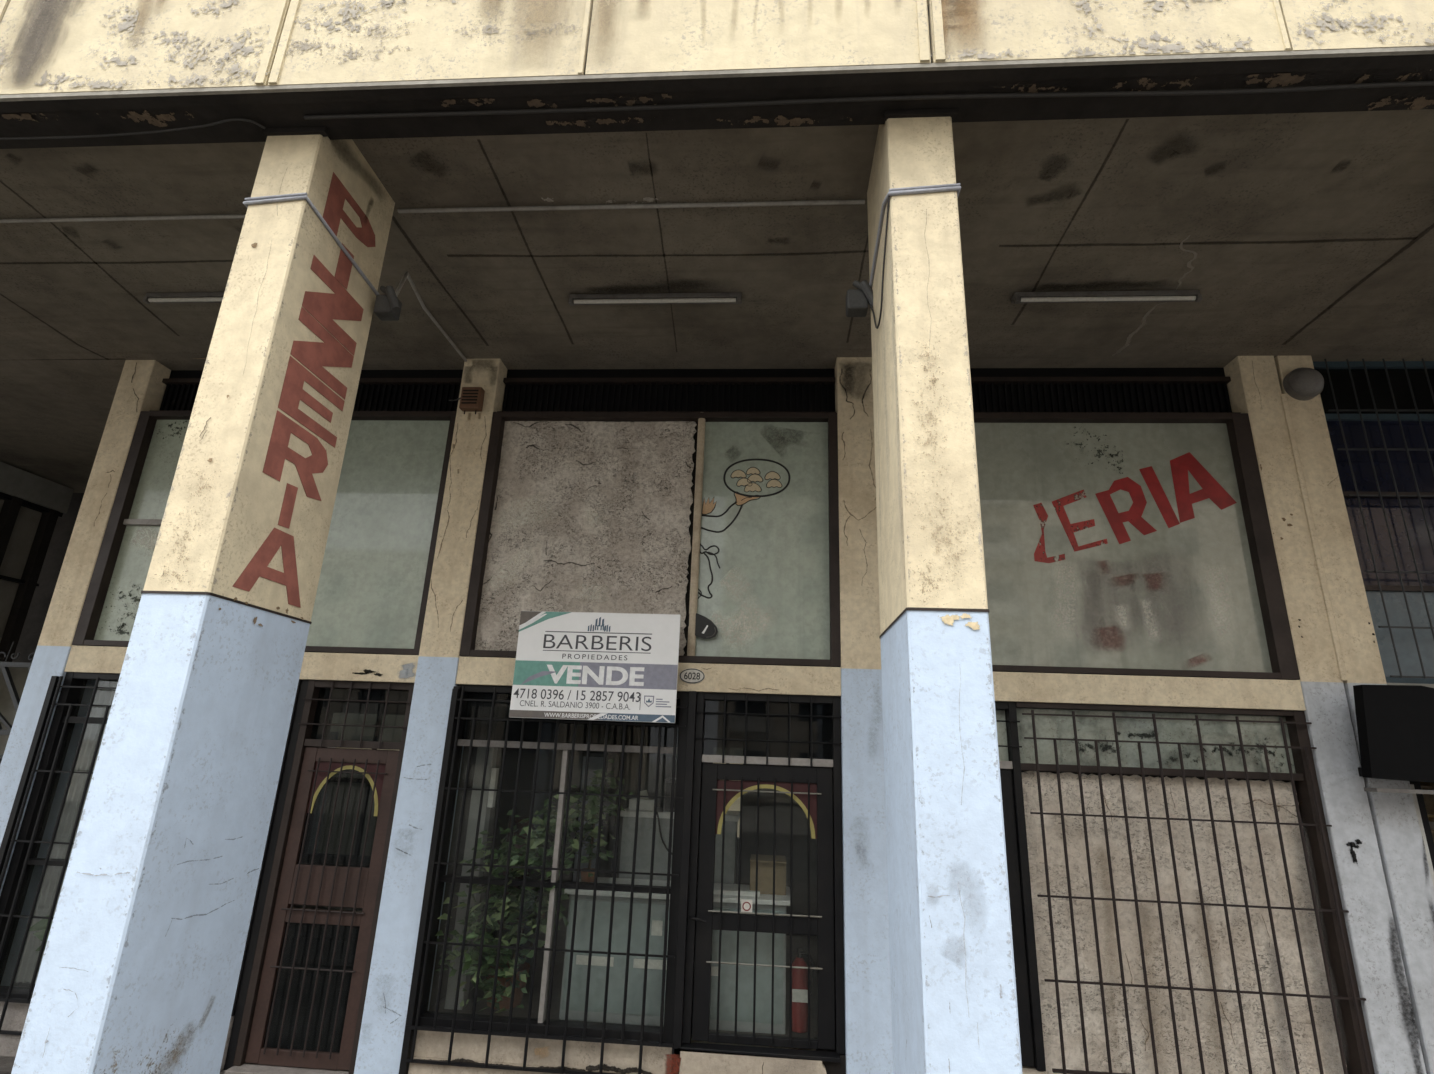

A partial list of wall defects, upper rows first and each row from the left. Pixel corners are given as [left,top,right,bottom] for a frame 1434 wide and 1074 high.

leakage [17,0,70,78]
peeling [34,3,270,90]
peeling [285,0,456,64]
peeling [527,94,672,128]
peeling [716,115,818,126]
peeling [1246,73,1311,88]
peeling [1368,69,1434,111]
crack [840,369,876,579]
leakage [1391,923,1423,1074]